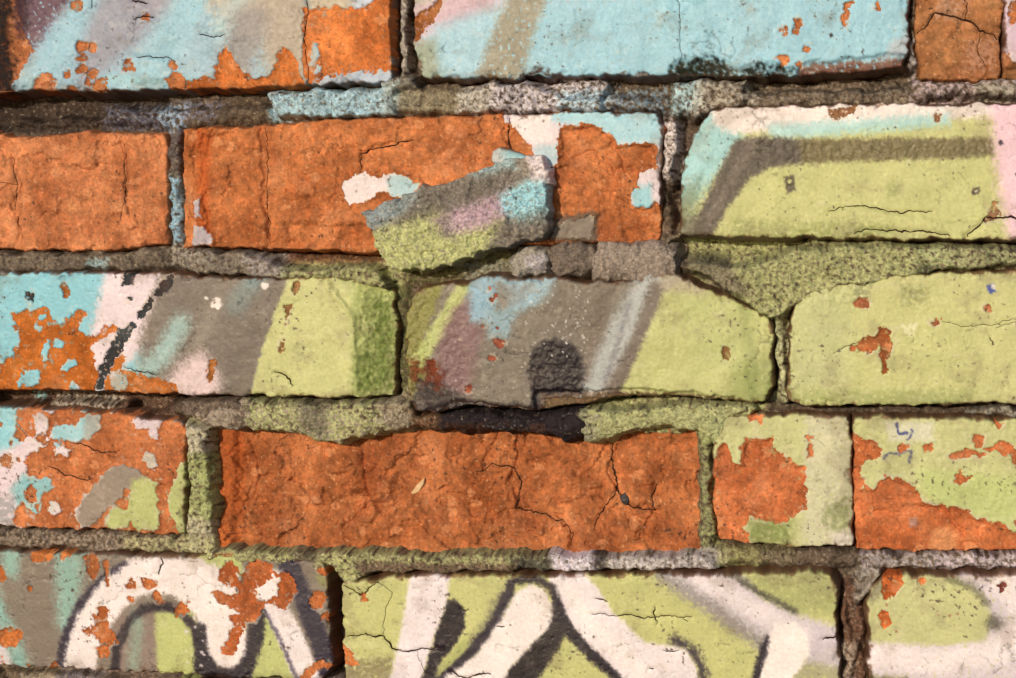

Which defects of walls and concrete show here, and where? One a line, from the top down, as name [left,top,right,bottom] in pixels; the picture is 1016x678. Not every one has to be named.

peeling [0,0,109,101]
peeling [164,0,400,96]
crack [916,0,1012,66]
spalling [0,113,534,256]
spalling [522,110,663,246]
crack [830,205,1016,236]
peeling [0,272,179,394]
peeling [0,404,189,535]
crack [478,443,658,545]
peeling [712,435,814,543]
spalling [852,431,1016,552]
peeling [82,606,119,658]